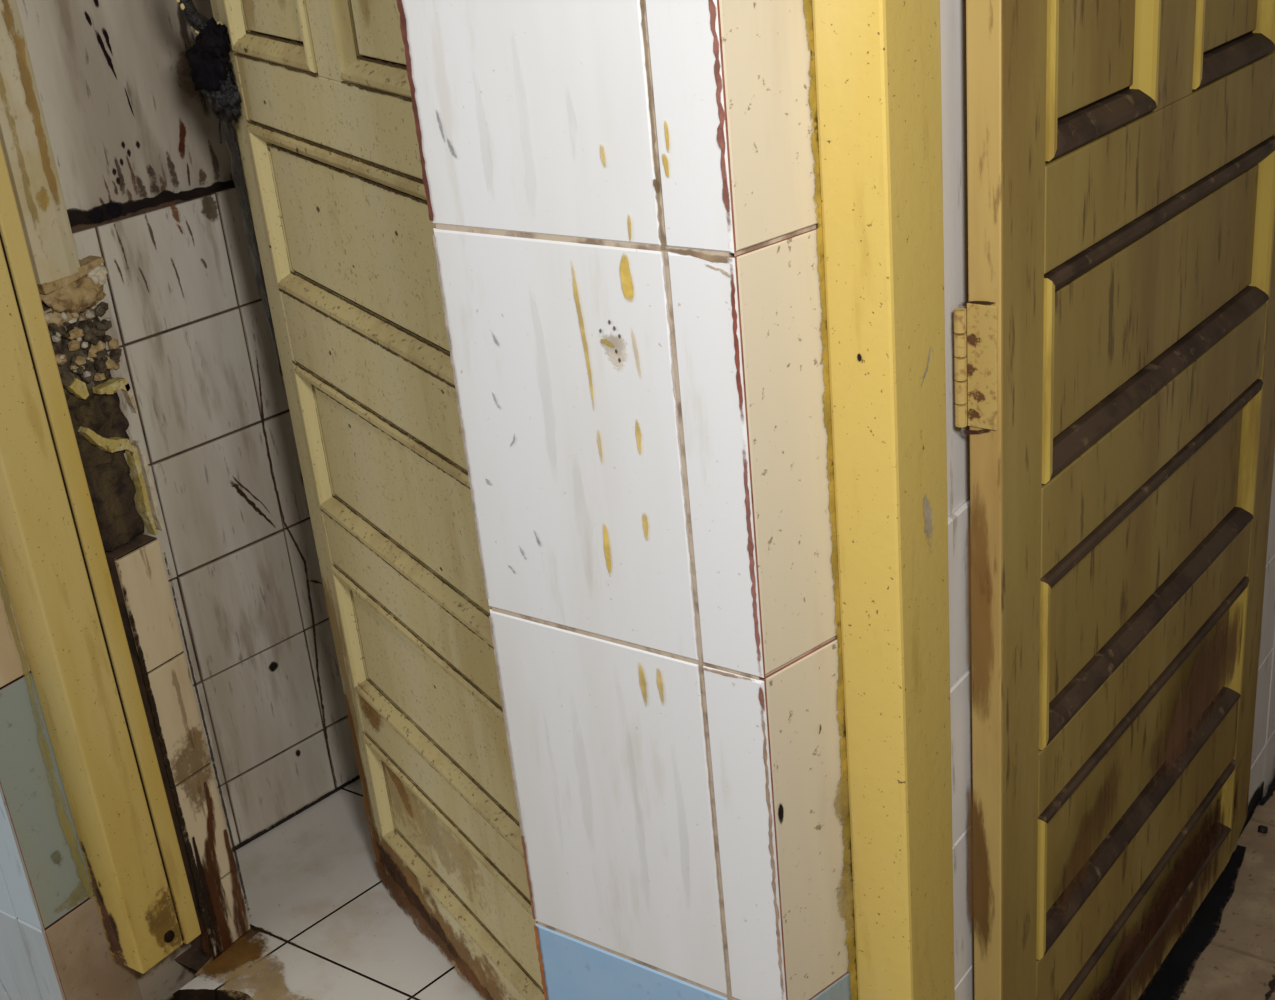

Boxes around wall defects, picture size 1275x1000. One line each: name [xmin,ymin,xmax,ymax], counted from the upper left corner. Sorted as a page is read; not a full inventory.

water stain [85,0,134,115]
water stain [177,7,195,50]
spalling [37,255,165,551]
rust [118,553,252,960]